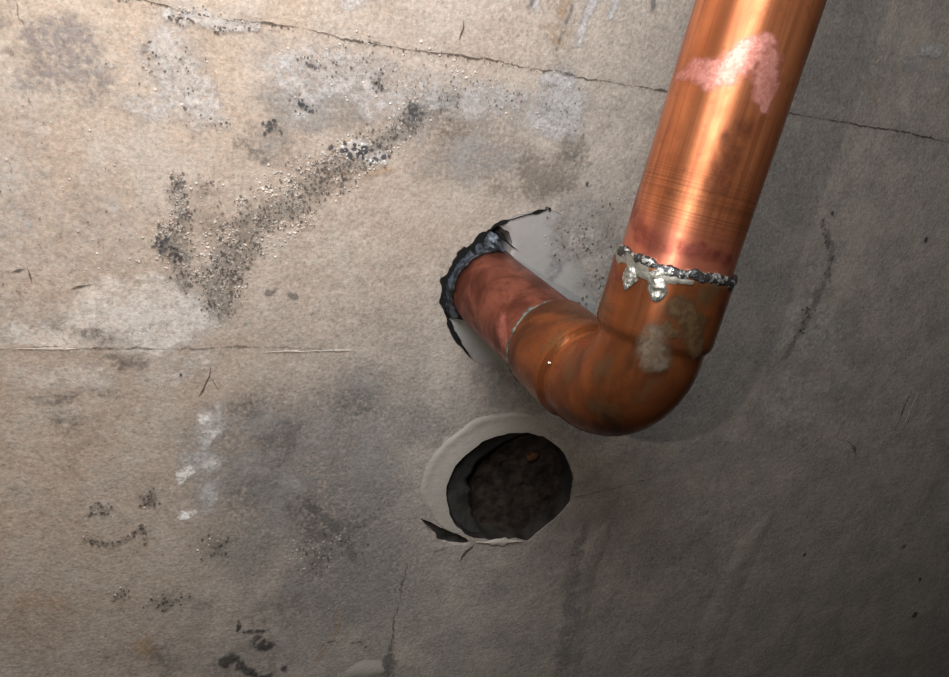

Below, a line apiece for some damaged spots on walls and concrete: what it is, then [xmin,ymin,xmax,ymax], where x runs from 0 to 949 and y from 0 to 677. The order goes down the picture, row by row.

crack [118,0,186,16]
damp [25,19,106,87]
damp [123,25,222,121]
crack [221,18,668,92]
crack [789,112,946,142]
crack [85,345,249,396]